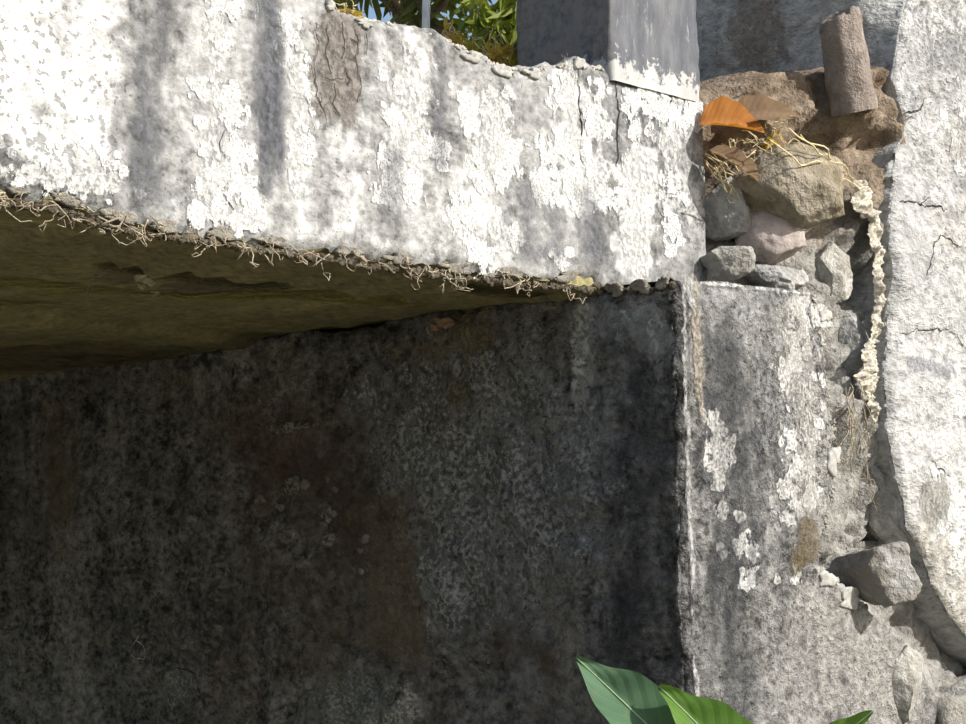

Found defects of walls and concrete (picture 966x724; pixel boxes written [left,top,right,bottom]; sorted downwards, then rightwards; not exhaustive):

leakage [254,0,284,191]
peeling [0,0,703,297]
crack [901,197,962,274]
crack [905,328,966,348]